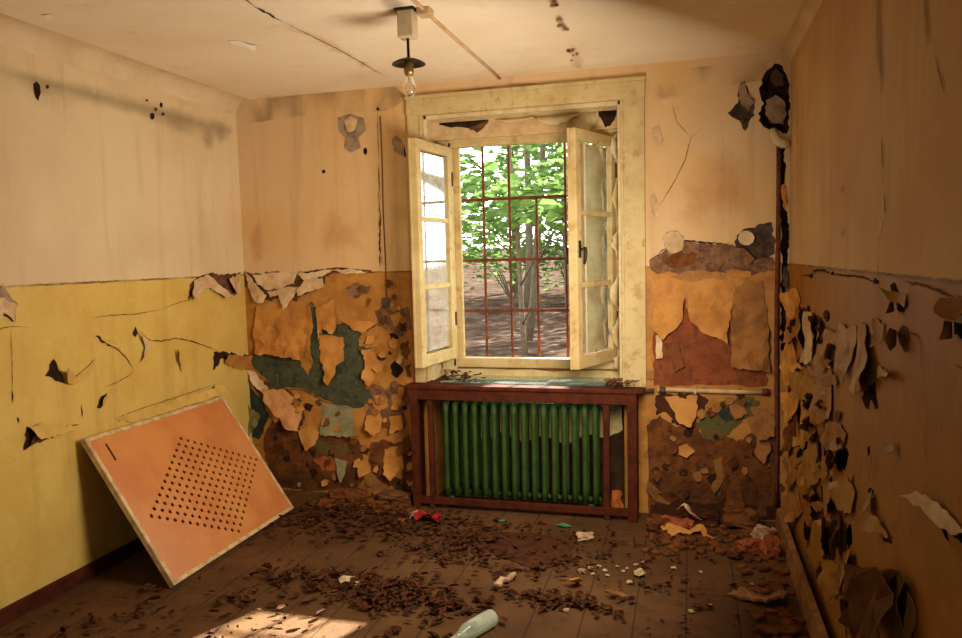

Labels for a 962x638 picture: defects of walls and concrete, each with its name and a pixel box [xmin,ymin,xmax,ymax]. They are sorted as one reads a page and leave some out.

crack [246,0,386,77]
spalling [728,63,790,134]
spalling [337,114,367,155]
peeling [0,284,18,322]
peeling [133,326,150,361]
peeling [45,359,95,384]
peeling [188,267,413,495]
peeling [646,148,962,638]
peeling [23,423,81,451]